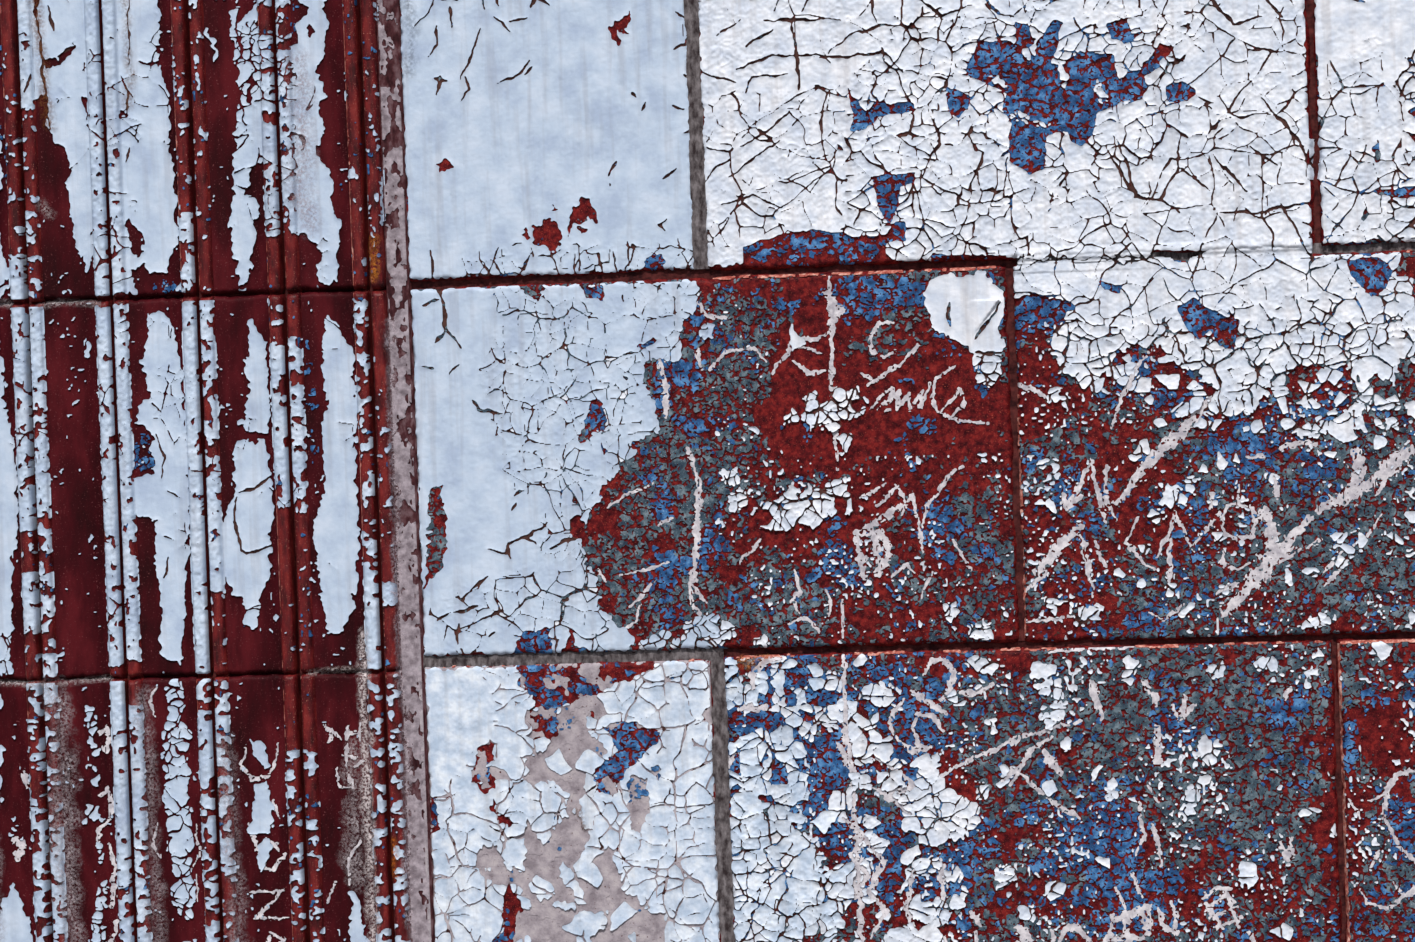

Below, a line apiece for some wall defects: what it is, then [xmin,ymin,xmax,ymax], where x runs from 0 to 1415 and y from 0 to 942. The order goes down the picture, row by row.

peeling [0,0,879,942]
crack [401,0,1415,942]
peeling [698,0,1415,942]